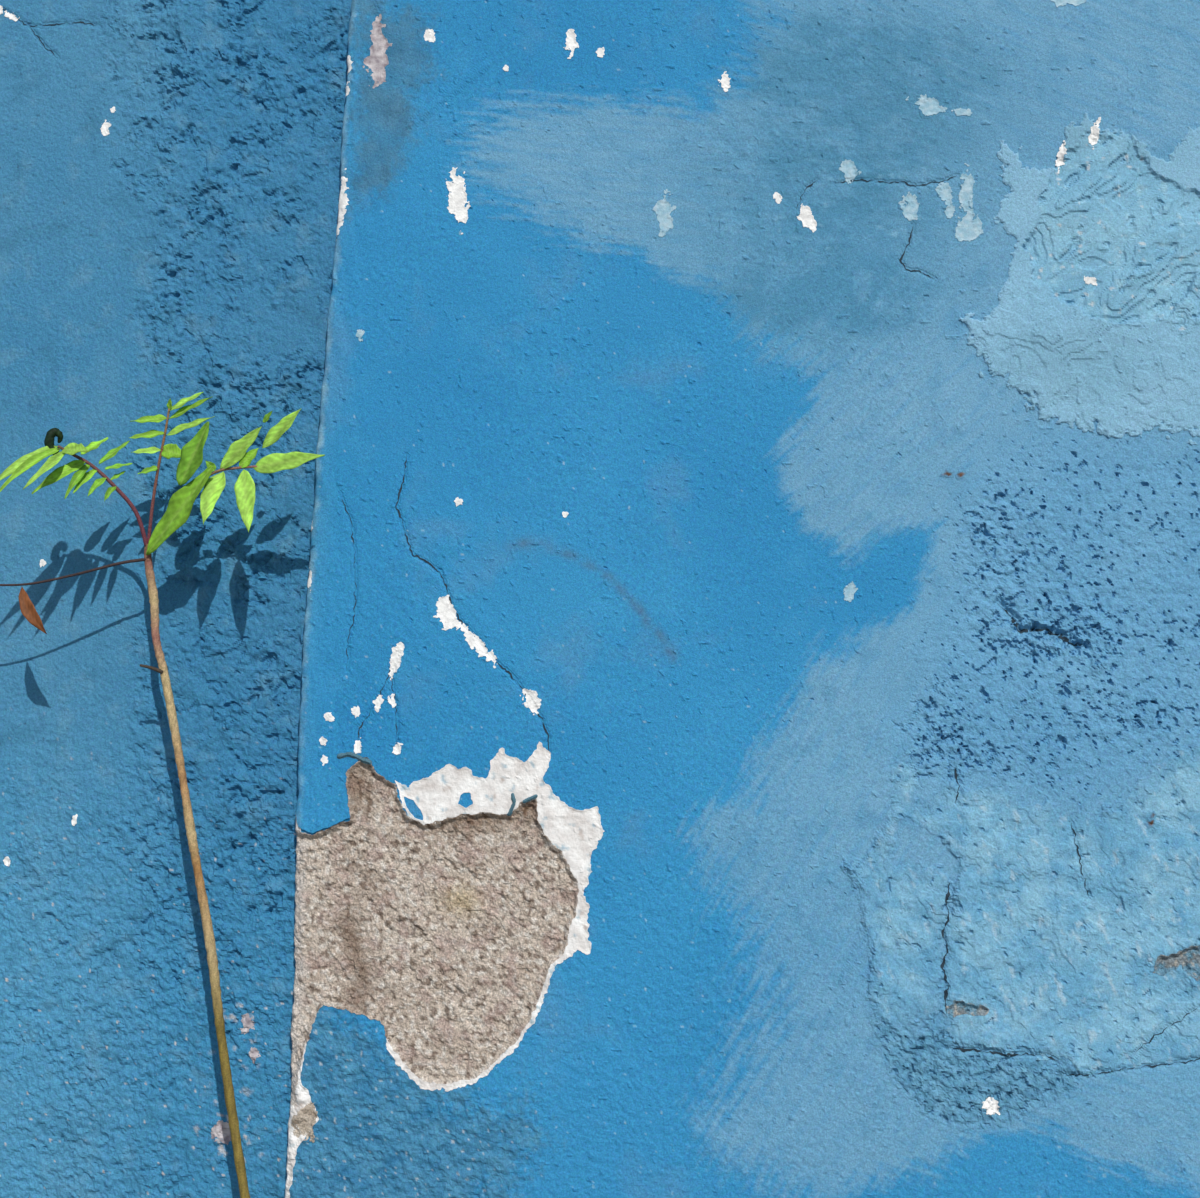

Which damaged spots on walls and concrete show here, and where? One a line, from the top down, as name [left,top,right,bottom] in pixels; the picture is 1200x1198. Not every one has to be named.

peeling [346,14,393,96]
peeling [446,167,471,235]
crack [796,175,957,210]
crack [899,229,934,279]
crack [342,500,357,670]
crack [395,455,549,750]
peeling [351,642,405,718]
peeling [520,688,541,715]
spalling [285,736,604,1198]
peeling [840,744,1200,1132]